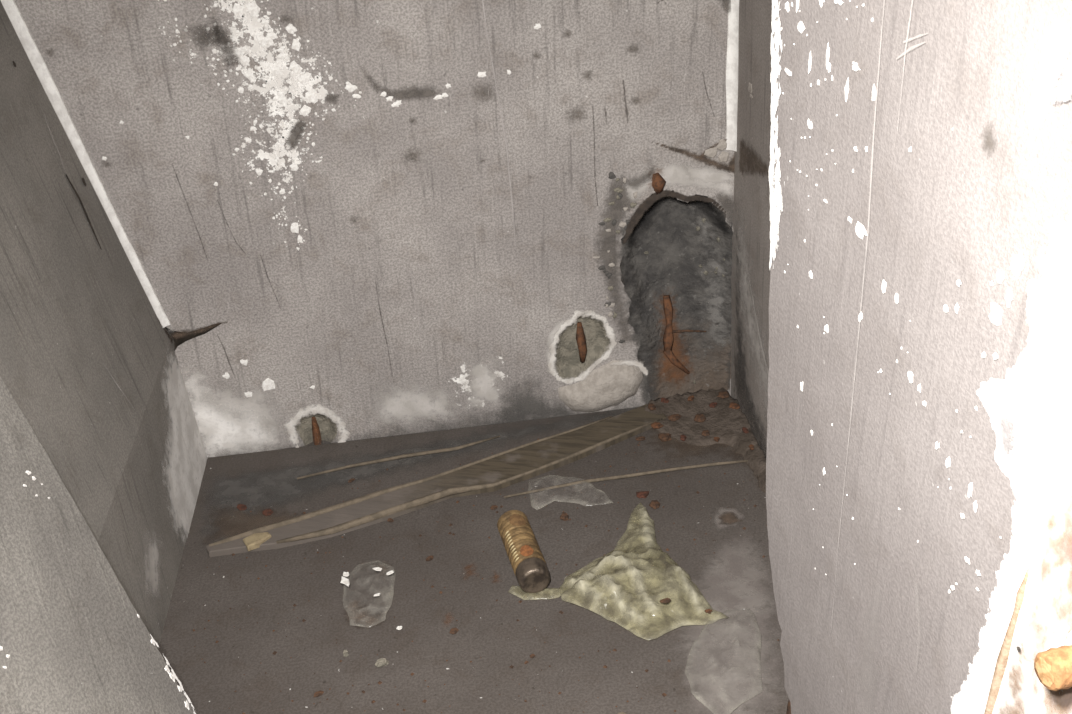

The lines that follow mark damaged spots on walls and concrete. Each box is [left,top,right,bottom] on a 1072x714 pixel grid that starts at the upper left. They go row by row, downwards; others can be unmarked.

peeling [808,42,833,87]
peeling [845,61,860,101]
crack [657,82,769,174]
peeling [768,0,822,273]
peeling [848,216,867,239]
spalling [546,164,734,405]
peeling [907,371,927,407]
efflorescence [162,357,287,536]
spalling [284,404,350,448]
peeling [951,220,1072,714]
efflorescence [145,537,161,594]